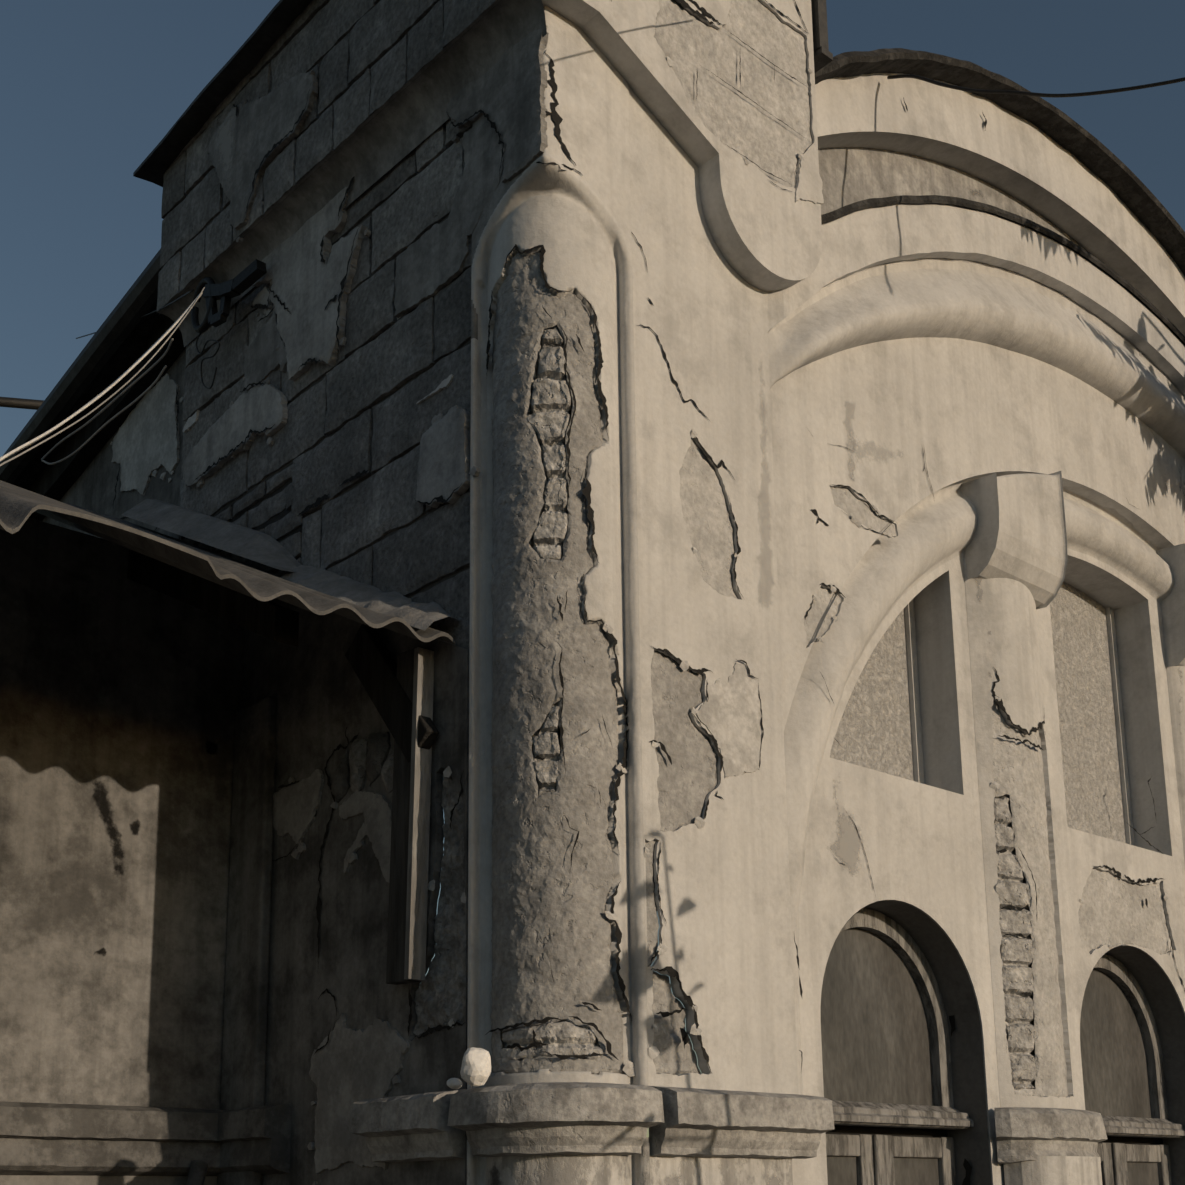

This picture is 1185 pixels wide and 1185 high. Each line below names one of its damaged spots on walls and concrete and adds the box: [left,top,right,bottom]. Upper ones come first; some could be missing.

peeling [394,25,549,318]
spalling [653,0,824,204]
peeling [110,177,371,504]
spalling [414,244,636,1077]
spalling [679,429,744,599]
leakage [93,782,140,874]
peeling [273,769,392,882]
peeling [307,766,466,1185]
spalling [644,646,762,1075]
spalling [989,668,1068,1097]